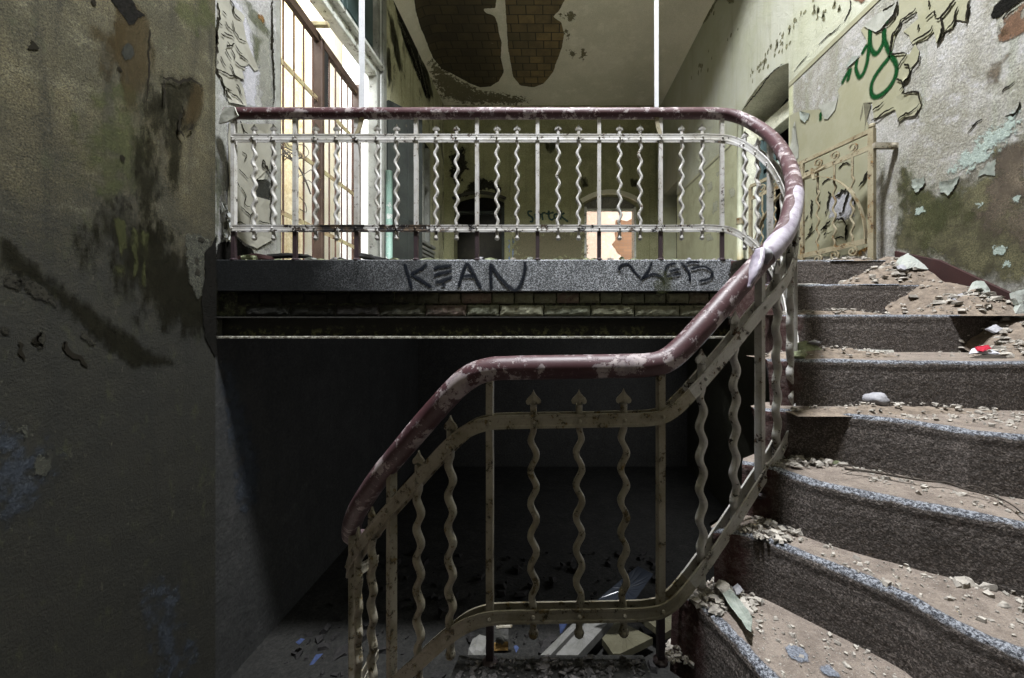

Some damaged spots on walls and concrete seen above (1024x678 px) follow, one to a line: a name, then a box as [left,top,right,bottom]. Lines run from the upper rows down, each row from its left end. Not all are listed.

flaking render [112,0,145,25]
flaking render [414,0,587,106]
flaking render [991,0,1024,42]
damp [75,7,204,337]
peeling [185,0,272,356]
peeling [750,0,970,265]
peeling [939,110,1022,196]
damp [2,237,172,368]
peeling [992,245,1011,268]